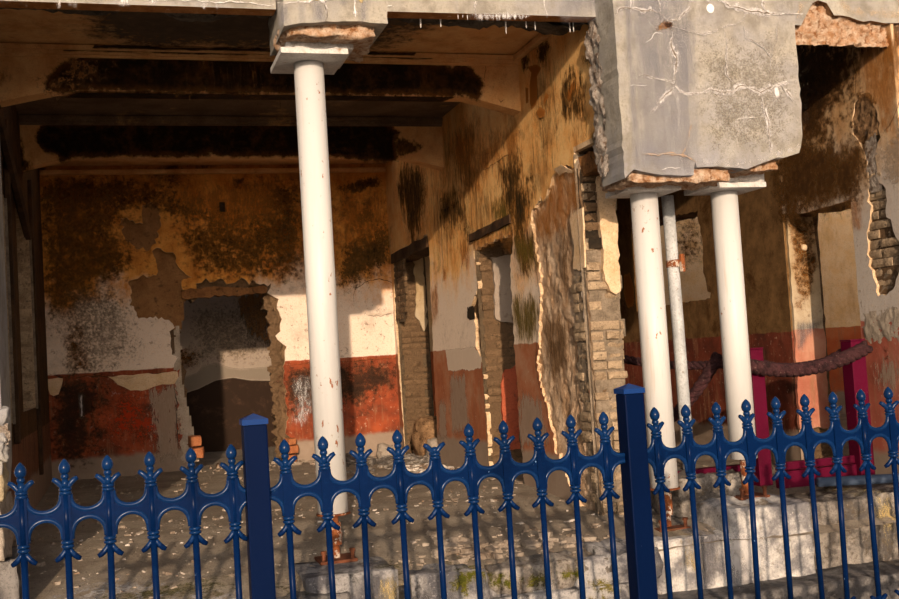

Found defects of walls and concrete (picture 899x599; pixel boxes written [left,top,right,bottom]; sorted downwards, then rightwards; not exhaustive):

crack [183,0,328,21]
water stain [397,162,426,242]
water stain [440,124,576,295]
crack [639,125,696,170]
crack [616,0,803,154]
spalling [795,3,899,54]
flaking render [850,91,899,295]
water stain [40,175,312,467]
flaking render [109,204,284,463]
water stain [340,361,397,406]
flaking render [519,163,602,457]
flaking render [580,467,605,516]